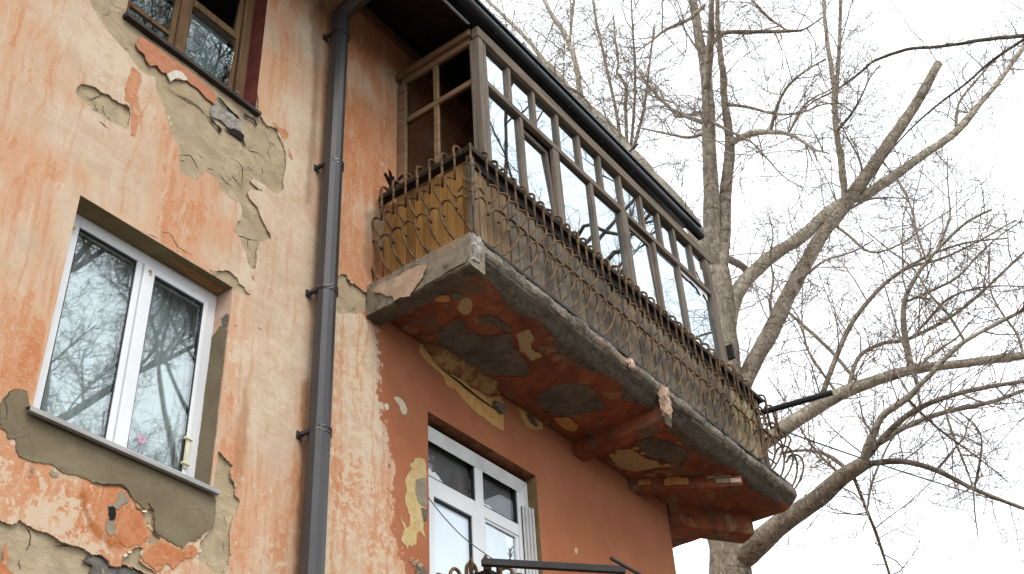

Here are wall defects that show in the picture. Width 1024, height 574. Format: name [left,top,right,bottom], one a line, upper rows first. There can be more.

spalling [76,0,293,269]
spalling [210,269,250,296]
peeling [336,233,482,314]
peeling [384,397,407,415]
spalling [419,295,543,430]
spalling [518,383,605,432]
spalling [658,384,673,420]
spalling [608,438,691,486]
spalling [0,452,240,574]
peeling [401,458,428,574]